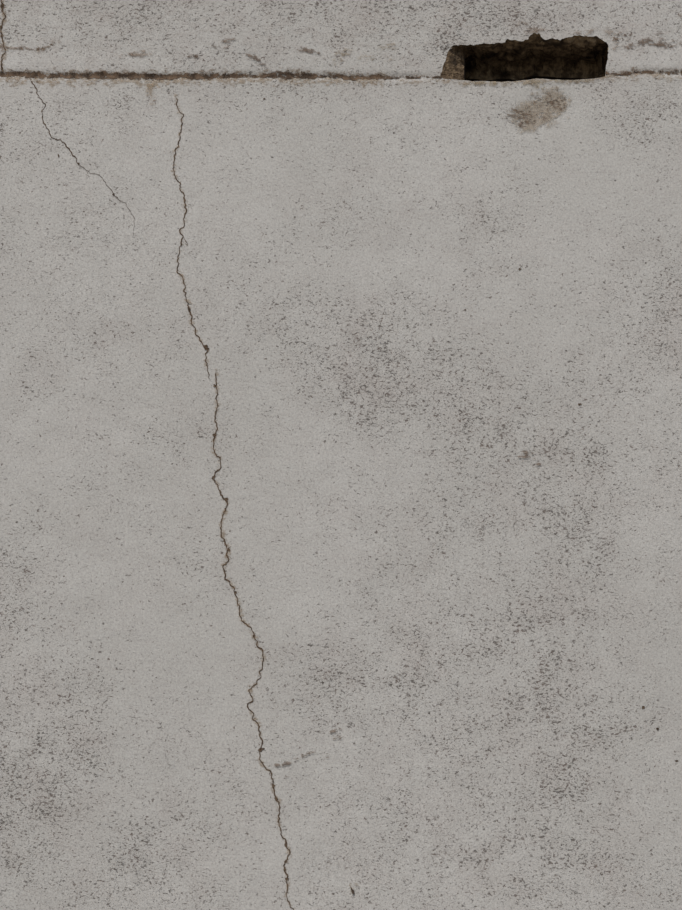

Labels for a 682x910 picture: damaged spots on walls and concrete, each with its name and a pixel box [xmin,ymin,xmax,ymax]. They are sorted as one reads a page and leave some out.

crack [0,0,55,72]
spalling [440,23,682,132]
crack [30,78,135,236]
crack [173,96,294,910]